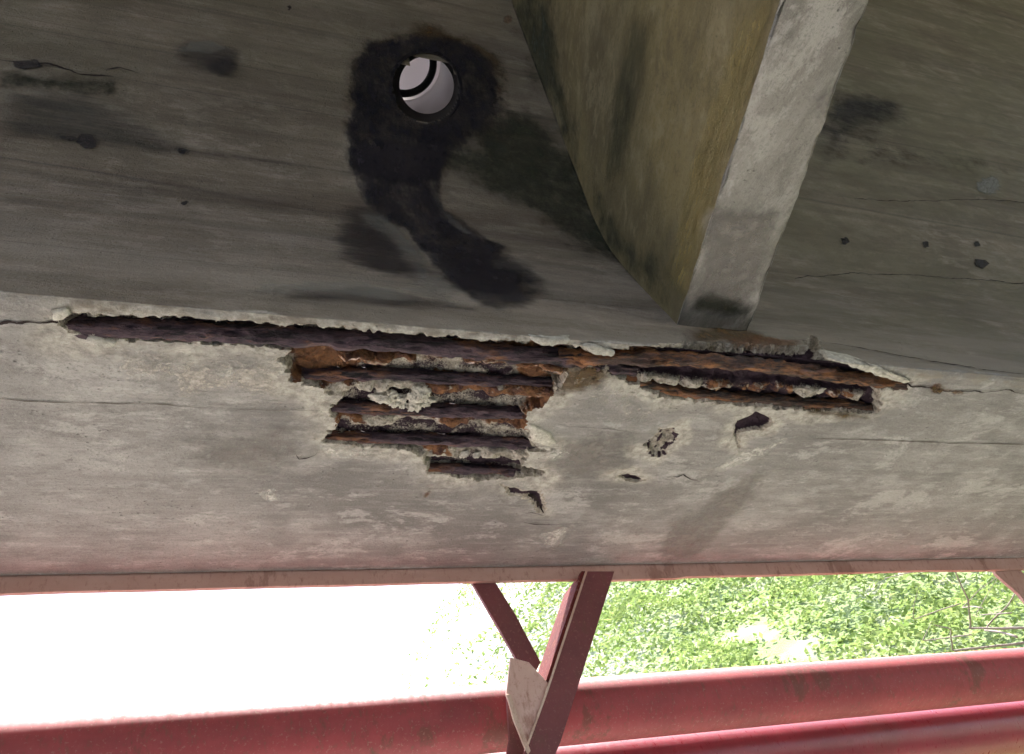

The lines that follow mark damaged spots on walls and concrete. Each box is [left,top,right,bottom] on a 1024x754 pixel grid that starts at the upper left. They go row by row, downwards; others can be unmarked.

crack [0,59,137,77]
water stain [513,0,562,103]
water stain [823,98,897,140]
water stain [341,35,654,304]
corrosion [65,316,908,419]
crack [834,343,1021,394]
spalling [51,307,914,513]
corrosion [325,430,537,450]
corrosion [428,462,521,477]